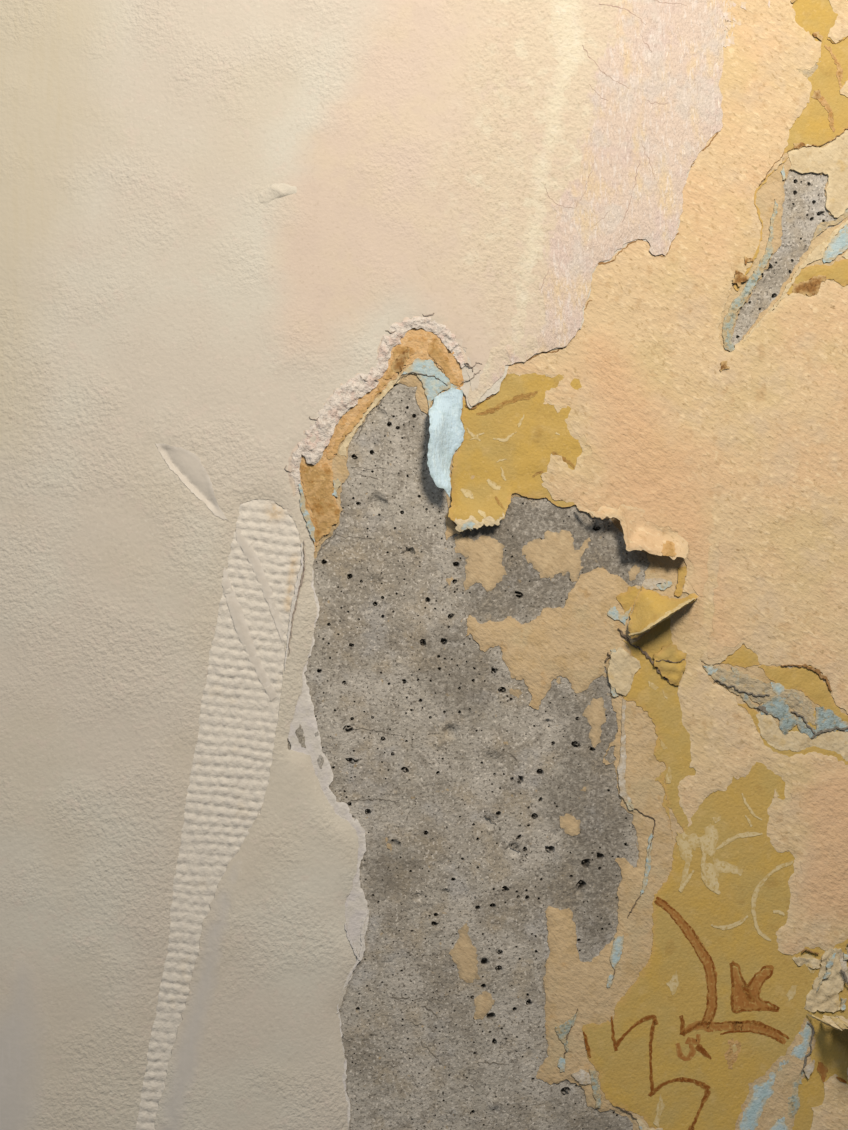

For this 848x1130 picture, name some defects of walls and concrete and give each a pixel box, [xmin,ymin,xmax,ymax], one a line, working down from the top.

peeling [722,128,848,352]
peeling [287,0,747,1130]
peeling [703,645,848,761]
peeling [735,944,848,1130]